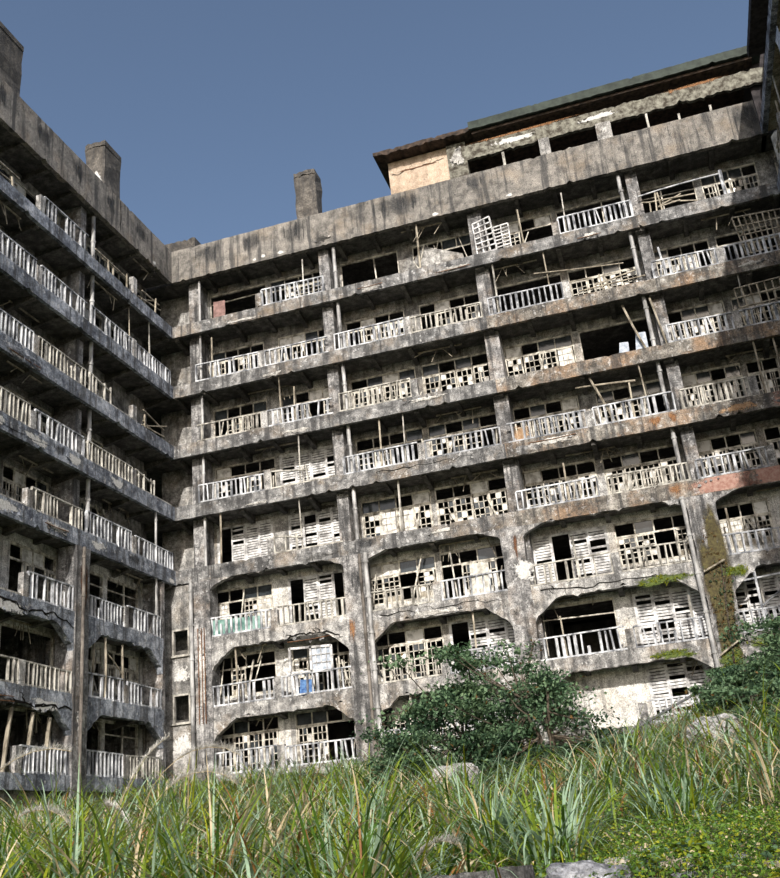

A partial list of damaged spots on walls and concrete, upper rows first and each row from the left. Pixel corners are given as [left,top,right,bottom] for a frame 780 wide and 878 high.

water stain [734,104,761,132]
water stain [373,197,416,217]
water stain [243,236,257,249]
crack [0,595,74,629]
peeling [28,698,59,712]